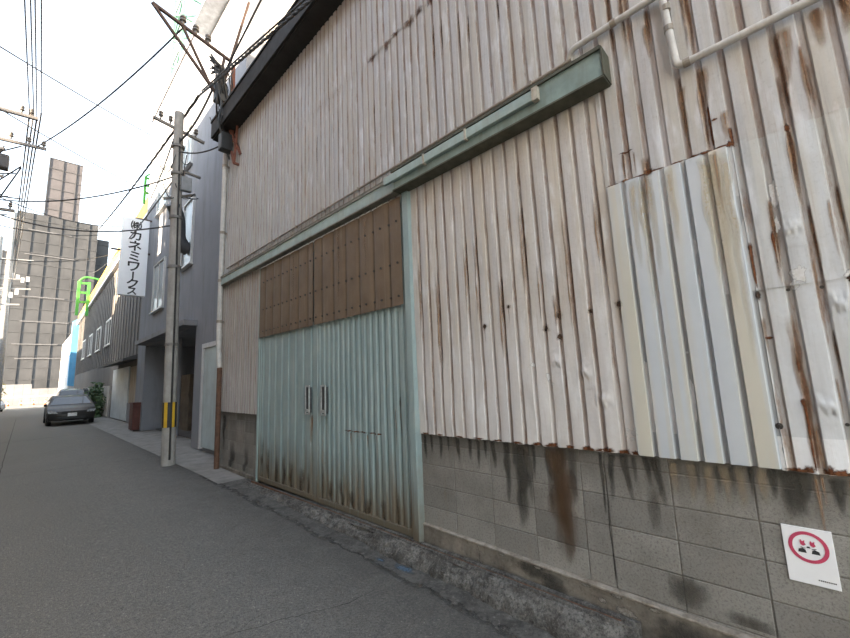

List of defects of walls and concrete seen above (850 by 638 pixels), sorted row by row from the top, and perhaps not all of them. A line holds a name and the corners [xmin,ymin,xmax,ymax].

corrosion [680,0,693,34]
corrosion [774,30,814,181]
corrosion [748,243,761,299]
corrosion [769,203,780,263]
corrosion [808,209,821,290]
corrosion [828,189,844,232]
corrosion [533,442,640,536]
water stain [599,453,665,510]
water stain [768,469,810,510]
water stain [830,480,846,508]
water stain [520,562,566,593]
water stain [736,616,769,633]